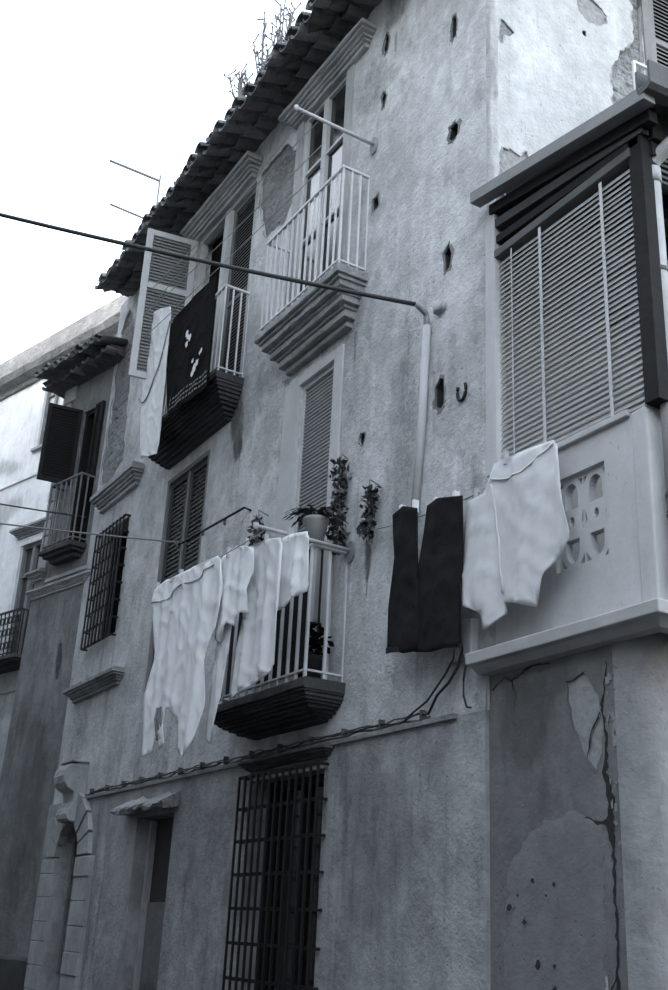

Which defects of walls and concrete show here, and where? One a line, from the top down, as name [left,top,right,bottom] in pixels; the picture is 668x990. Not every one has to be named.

flaking render [498,18,515,44]
flaking render [577,0,608,36]
flaking render [610,0,645,104]
flaking render [499,146,529,175]
flaking render [566,670,606,773]
crack [584,661,622,990]